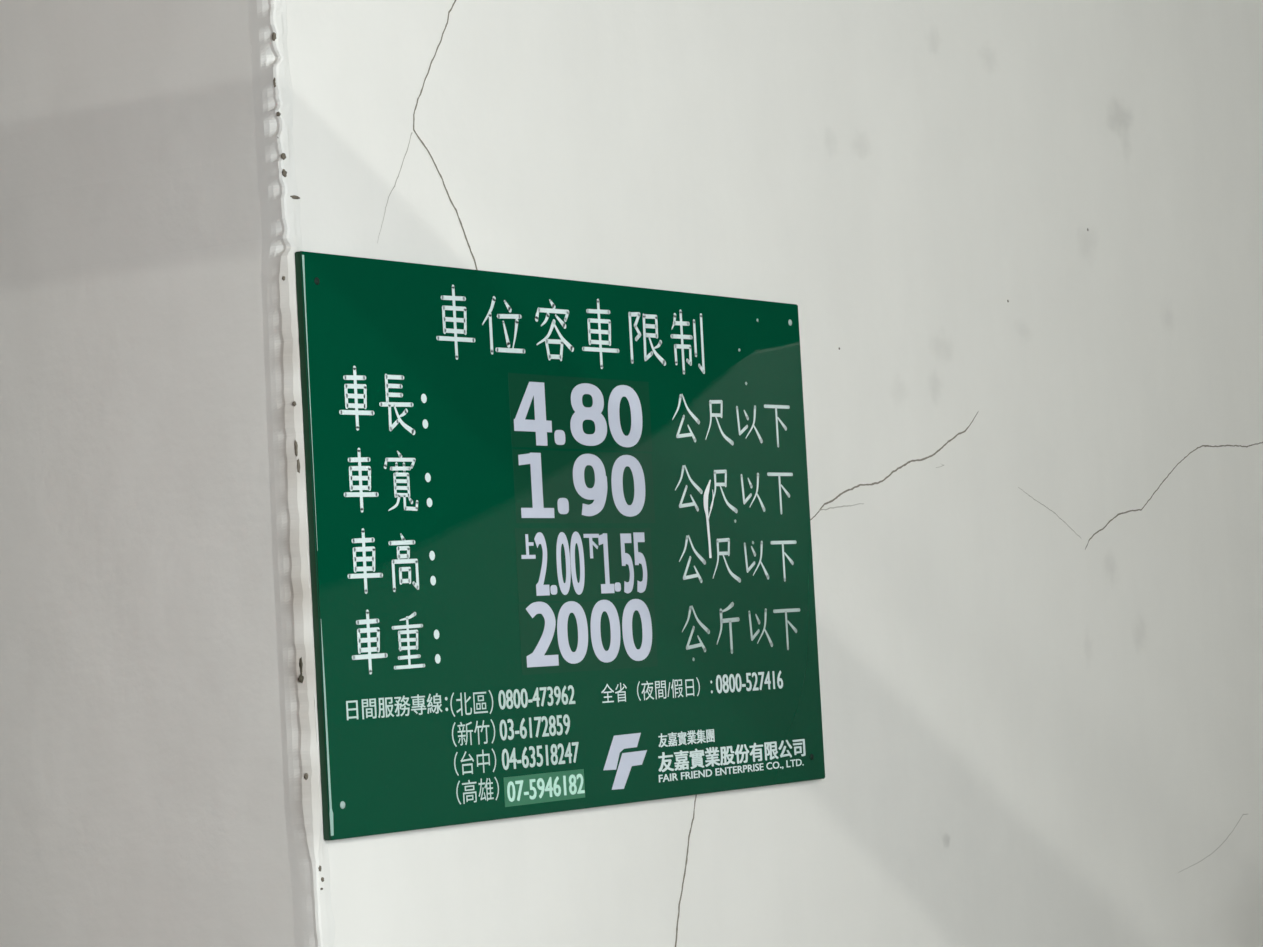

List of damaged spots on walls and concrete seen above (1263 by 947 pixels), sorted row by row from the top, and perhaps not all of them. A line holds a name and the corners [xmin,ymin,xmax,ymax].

crack [378,0,478,270]
crack [810,411,979,521]
crack [1018,442,1263,550]
crack [675,795,697,947]